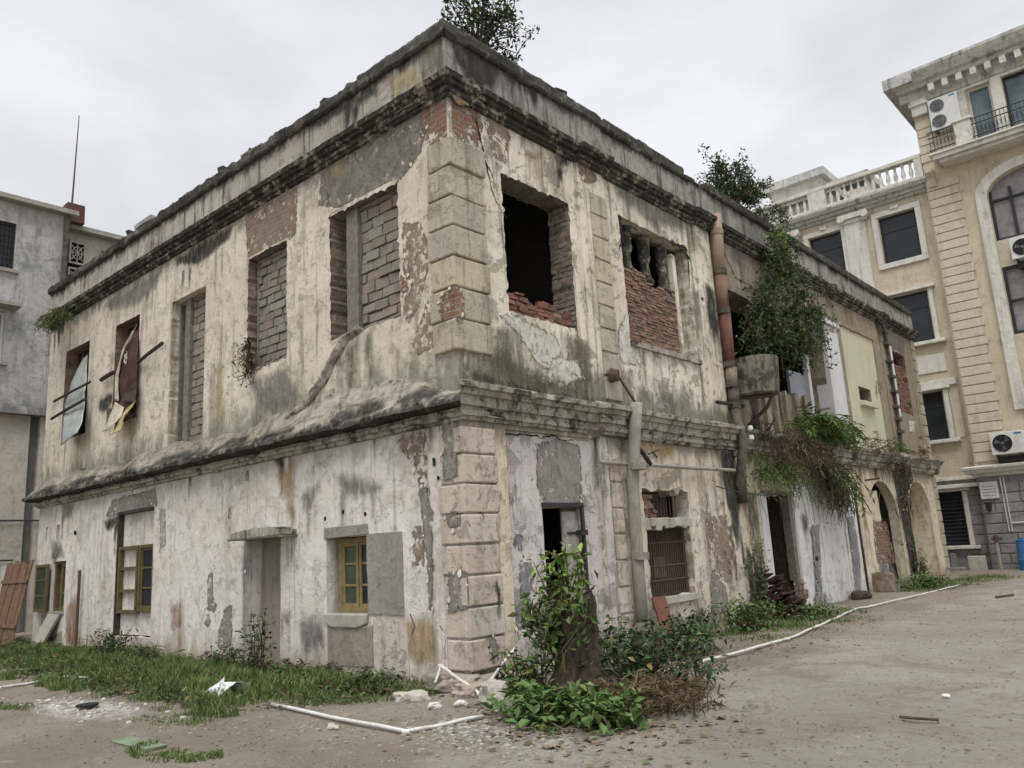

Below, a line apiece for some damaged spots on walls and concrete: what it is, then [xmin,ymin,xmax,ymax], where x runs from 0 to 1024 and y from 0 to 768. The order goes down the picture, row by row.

spalling [317,92,511,208]
crack [475,118,535,214]
water stain [177,228,232,284]
spalling [245,187,297,258]
flaking render [399,219,466,356]
water stain [475,330,589,401]
flaking render [499,311,586,391]
water stain [341,479,375,494]
spalling [395,430,469,614]
flaking render [440,420,458,481]
flaking render [204,573,245,650]